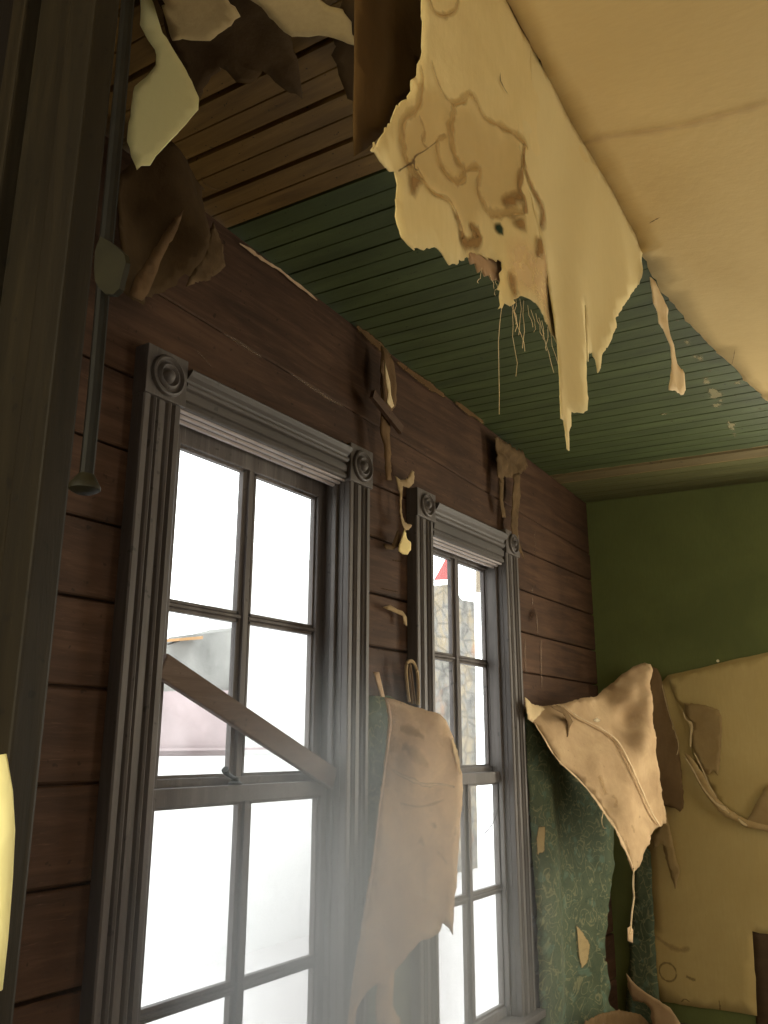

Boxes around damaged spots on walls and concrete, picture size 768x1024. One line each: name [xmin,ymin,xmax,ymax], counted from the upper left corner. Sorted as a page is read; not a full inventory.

damp [403,68,545,257]
peeling [704,378,722,407]
peeling [347,697,463,1024]
peeling [525,662,768,943]
peeling [752,931,768,1024]